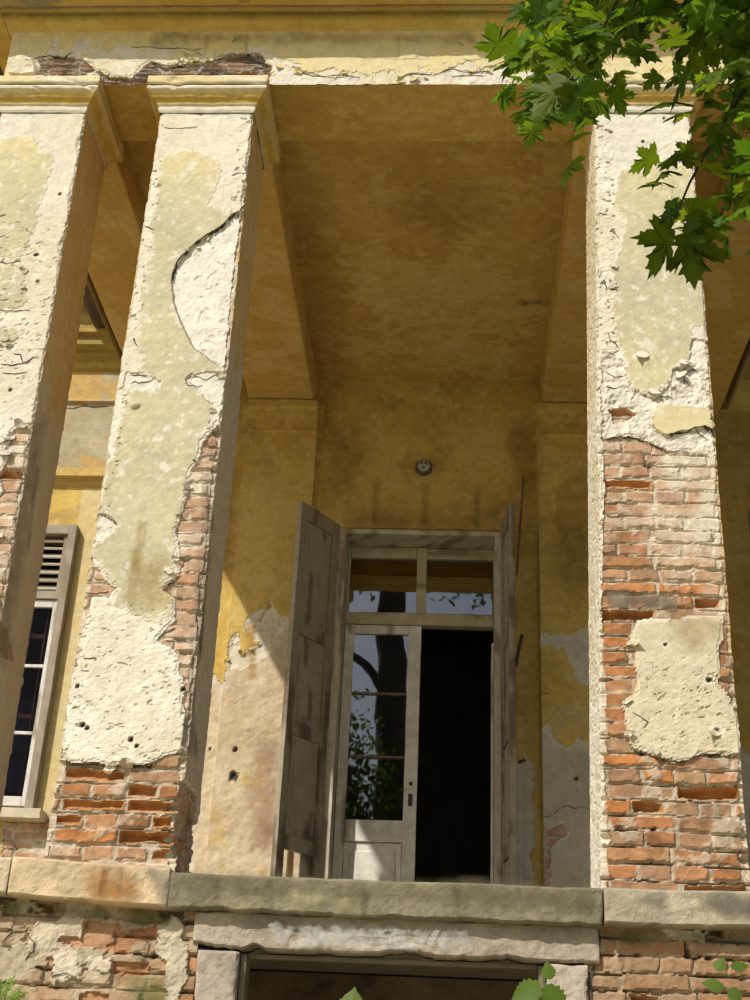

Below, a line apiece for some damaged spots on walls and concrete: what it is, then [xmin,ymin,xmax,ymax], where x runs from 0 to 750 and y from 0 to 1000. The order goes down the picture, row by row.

peeling [13,35,533,85]
crack [172,166,245,281]
peeling [0,112,289,877]
spalling [552,112,750,891]
peeling [539,625,589,685]
peeling [282,850,300,877]
peeling [516,725,591,888]
spalling [28,915,188,1000]